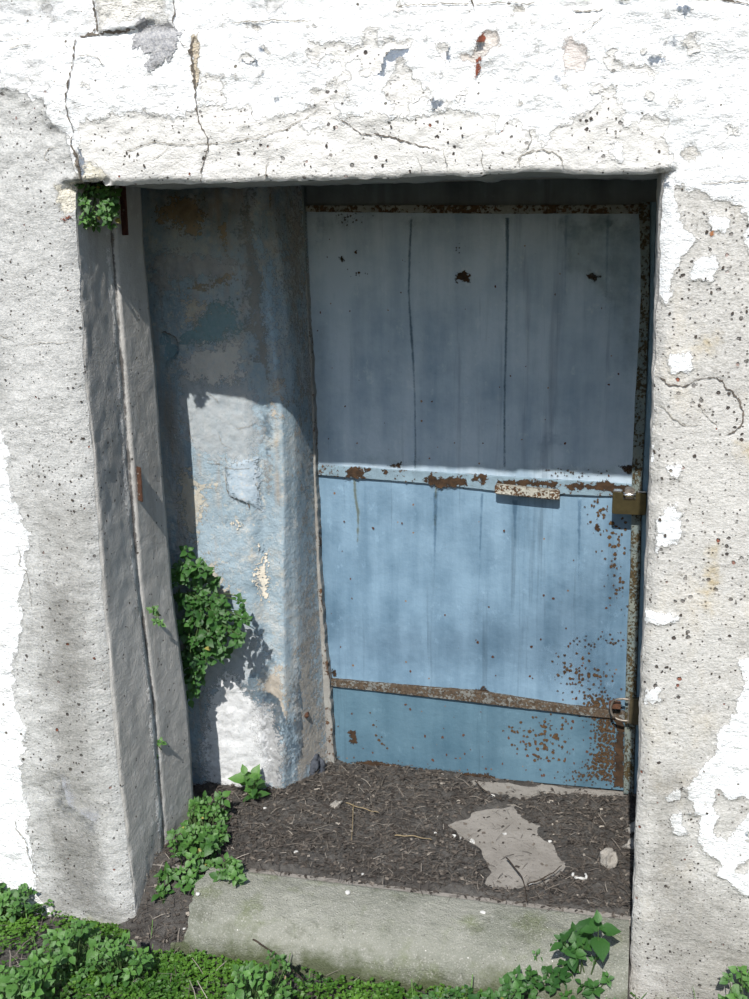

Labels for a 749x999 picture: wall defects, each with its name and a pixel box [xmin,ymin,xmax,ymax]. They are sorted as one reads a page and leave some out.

crack [44,39,106,183]
crack [126,37,318,183]
crack [340,120,448,173]
crack [392,0,534,10]
spalling [460,30,501,78]
rust [455,270,471,284]
peeling [170,202,273,512]
crack [659,377,745,435]
peeling [174,467,218,545]
rust [344,461,632,616]
peeling [629,183,749,999]
spalling [198,625,294,789]